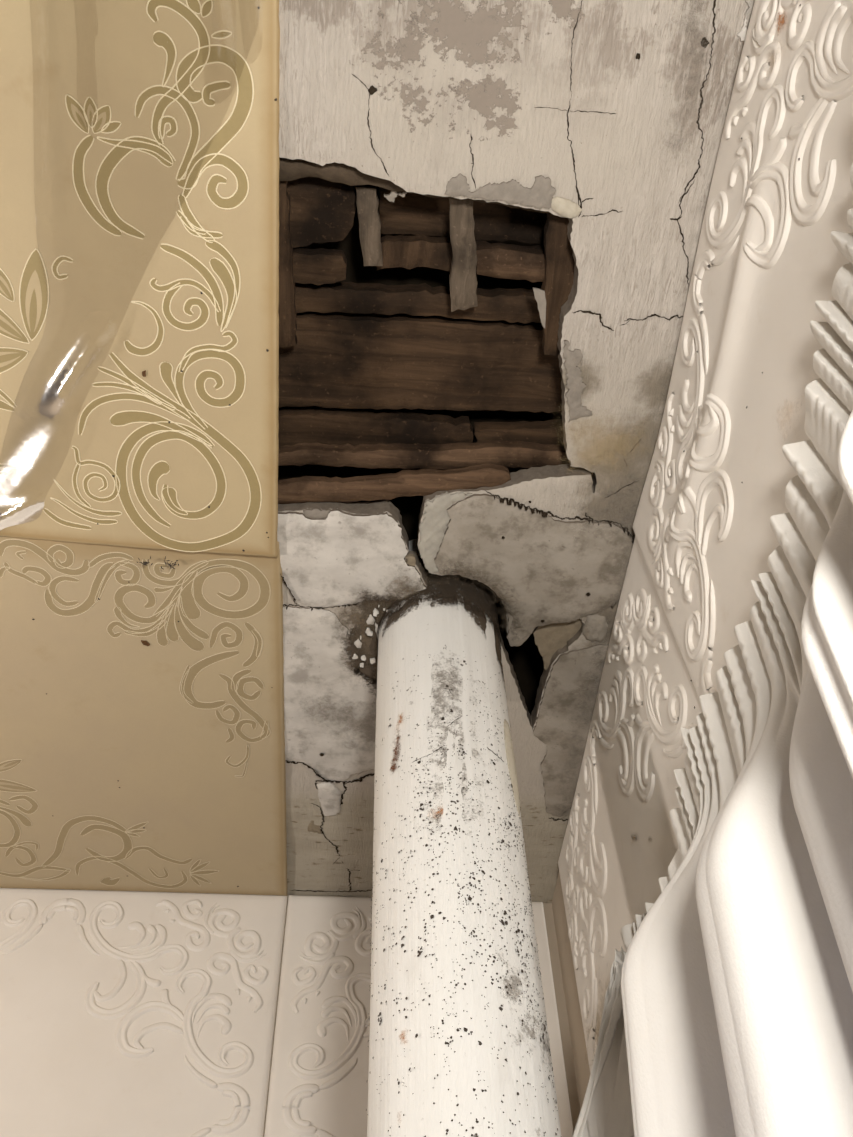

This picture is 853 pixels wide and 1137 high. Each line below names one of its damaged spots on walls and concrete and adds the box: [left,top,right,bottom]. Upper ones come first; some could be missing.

crack [535,1,622,217]
crack [670,0,716,287]
spalling [384,191,407,202]
spalling [445,174,582,218]
crack [572,310,683,331]
spalling [563,340,593,422]
spalling [303,506,331,519]
spalling [404,491,472,574]
crack [486,439,641,537]
peeling [352,605,388,667]
crack [286,760,375,892]
damp [337,550,558,1136]